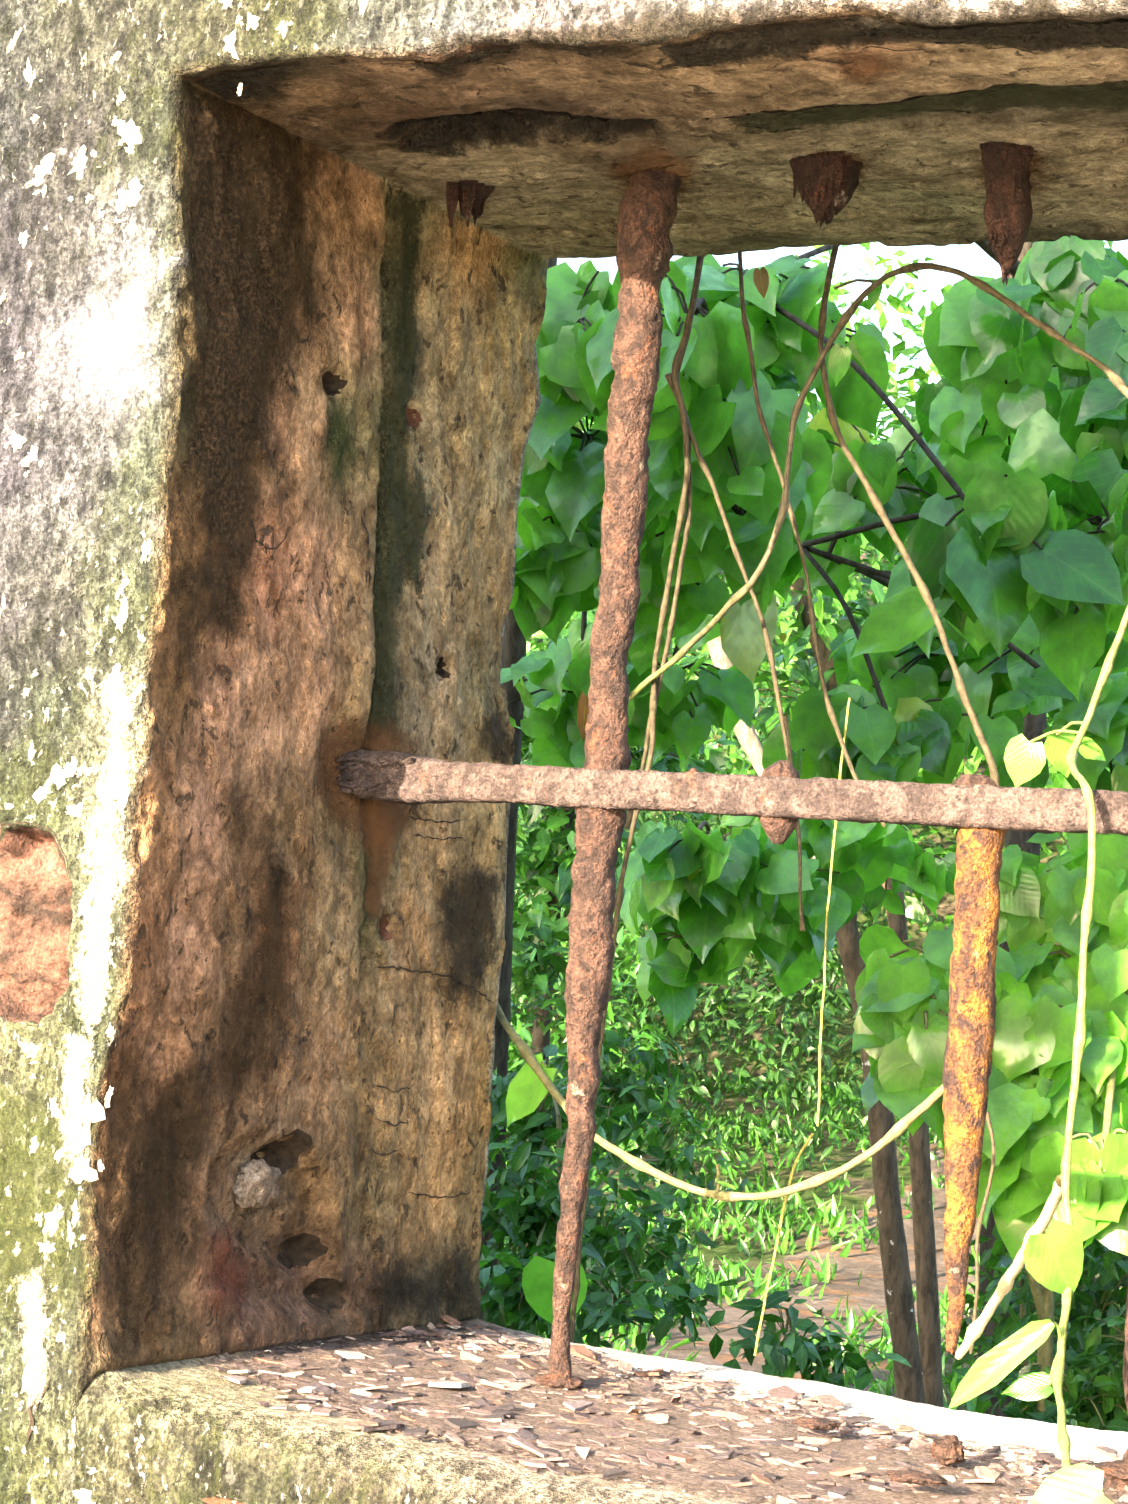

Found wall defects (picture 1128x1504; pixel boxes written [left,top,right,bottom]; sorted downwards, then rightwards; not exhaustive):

damp [388,46,625,79]
peeling [3,413,44,477]
damp [169,59,367,703]
peeling [141,530,154,564]
peeling [22,662,50,699]
peeling [103,576,145,812]
rust [317,724,421,914]
flaking render [0,719,85,1079]
mould [435,858,501,1008]
peeling [0,1052,114,1262]
peeling [14,1313,52,1398]